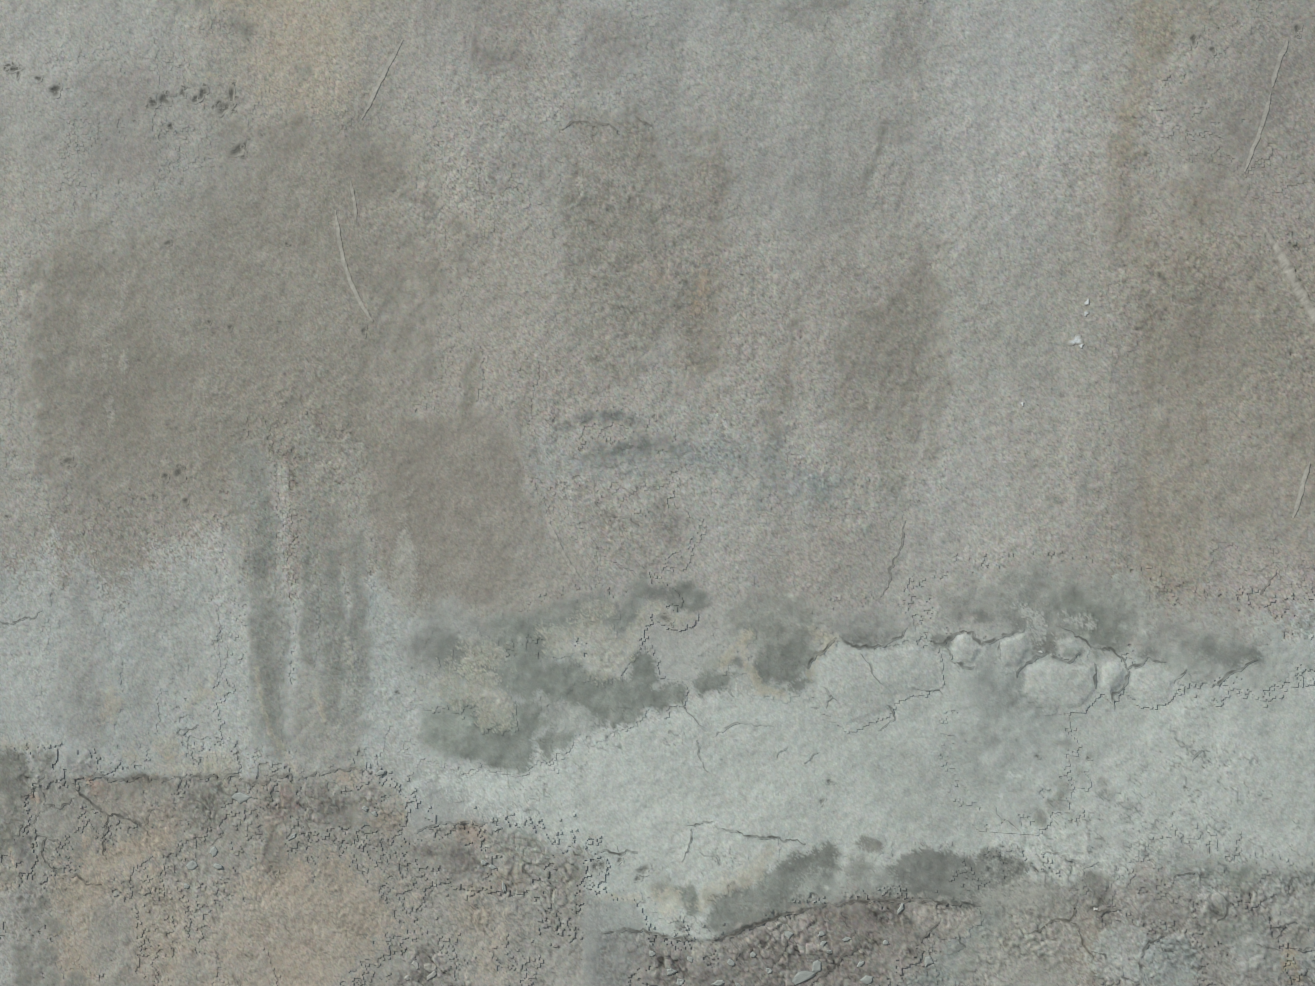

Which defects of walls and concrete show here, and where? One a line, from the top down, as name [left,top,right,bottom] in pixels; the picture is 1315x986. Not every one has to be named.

damp [441,0,536,88]
crack [807,627,1258,731]
crack [14,775,154,886]
spalling [0,746,652,986]
damp [0,870,86,986]
spalling [601,884,983,986]
damp [897,899,1018,986]
peeling [1101,865,1228,986]
peeling [1232,893,1286,949]